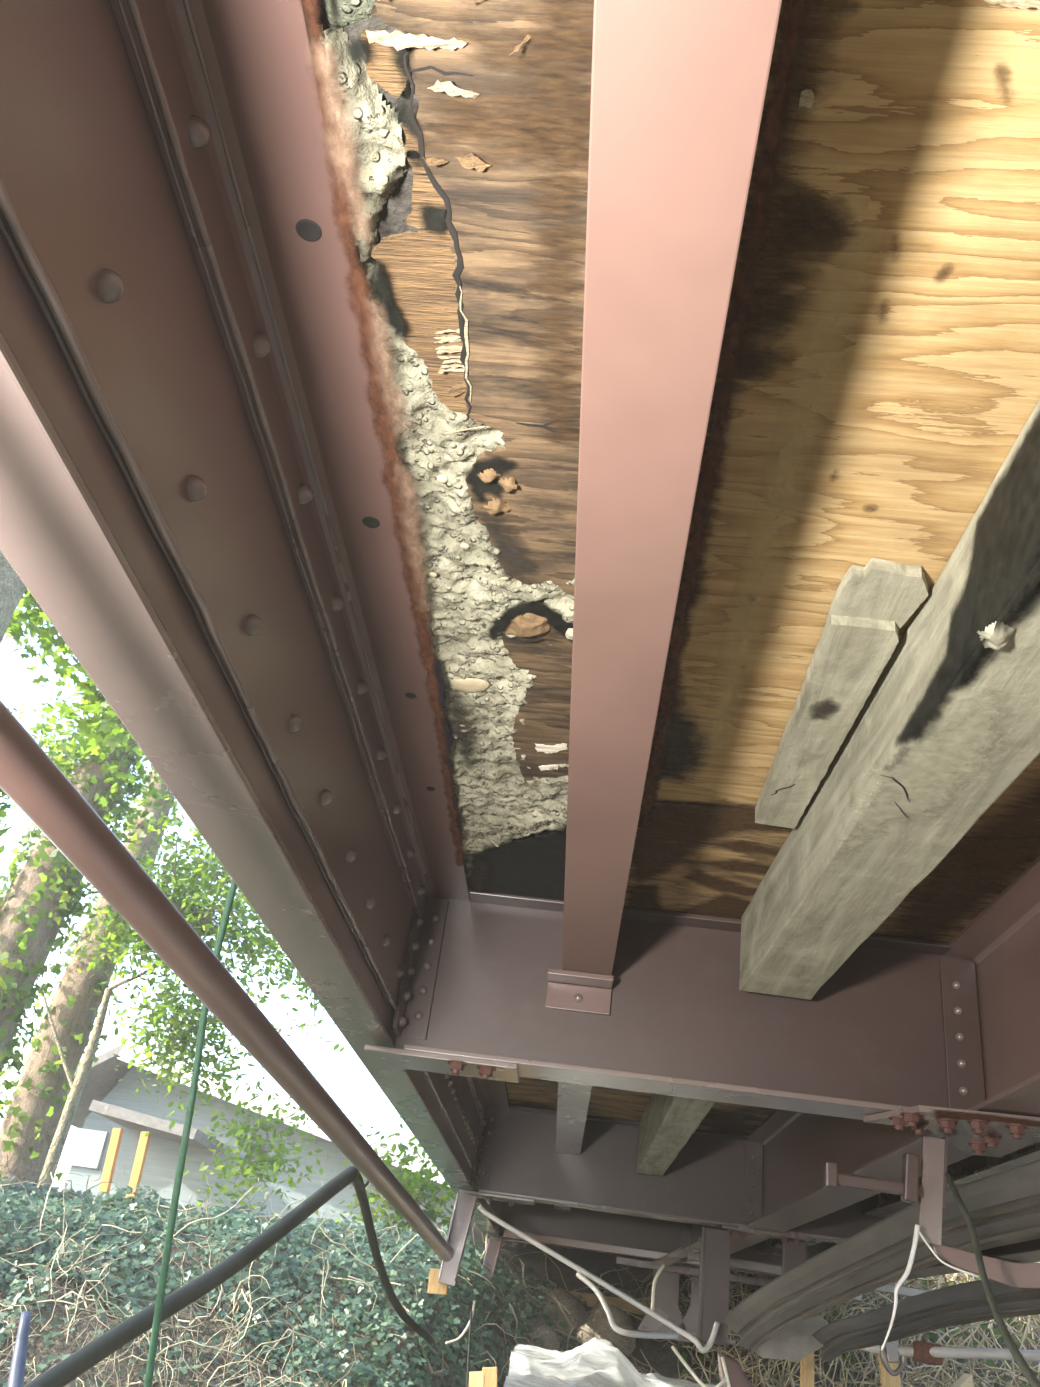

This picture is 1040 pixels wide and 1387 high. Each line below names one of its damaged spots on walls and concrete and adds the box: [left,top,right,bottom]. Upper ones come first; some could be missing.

crack [403,33,472,420]
damp [438,0,594,440]
damp [713,0,843,409]
corrosion [303,0,465,866]
spalling [317,24,575,878]
damp [432,658,567,901]
corrosion [933,1110,1040,1136]